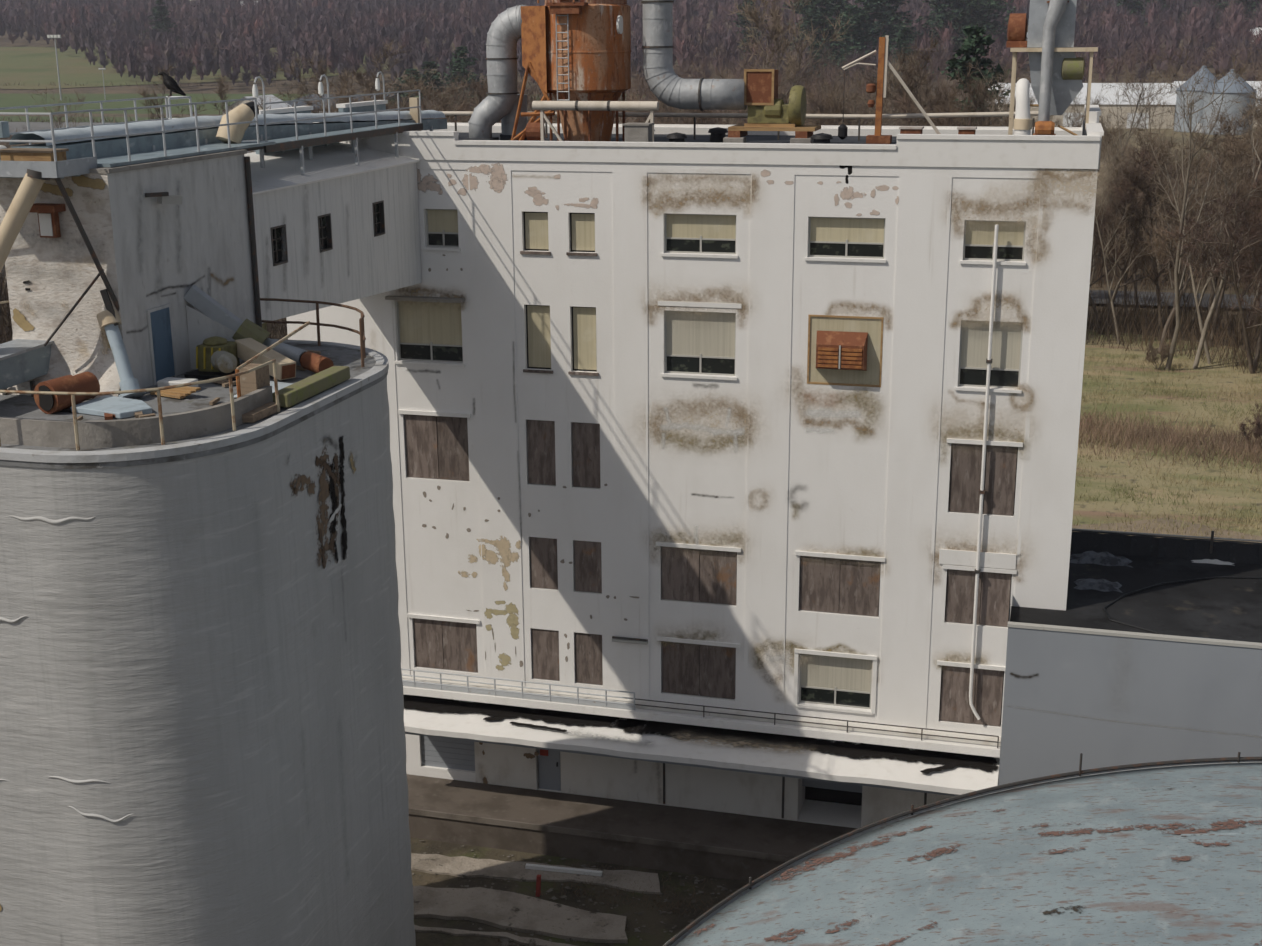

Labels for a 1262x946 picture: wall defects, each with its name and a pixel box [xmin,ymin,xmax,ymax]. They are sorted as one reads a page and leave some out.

peeling [417,163,507,195]
damp [646,180,756,209]
peeling [817,181,899,216]
damp [962,168,1096,211]
damp [805,391,873,434]
spalling [290,436,356,569]
peeling [458,528,523,670]
corrosion [772,825,932,883]
corrosion [907,845,960,861]
corrosion [1018,819,1262,862]
corrosion [1042,905,1086,914]
corrosion [764,928,805,943]